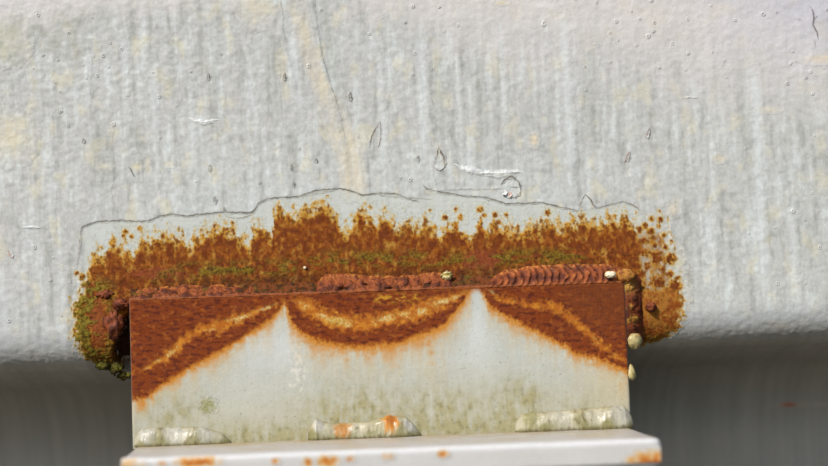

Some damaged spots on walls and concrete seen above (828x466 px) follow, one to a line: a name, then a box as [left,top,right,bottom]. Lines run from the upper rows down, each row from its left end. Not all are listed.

water stain [0,0,828,351]
peeling [501,174,522,198]
corrosion [66,195,694,429]
corrosion [121,455,228,466]
corrosion [299,452,356,466]
corrosion [435,448,451,459]
corrosion [618,445,661,463]